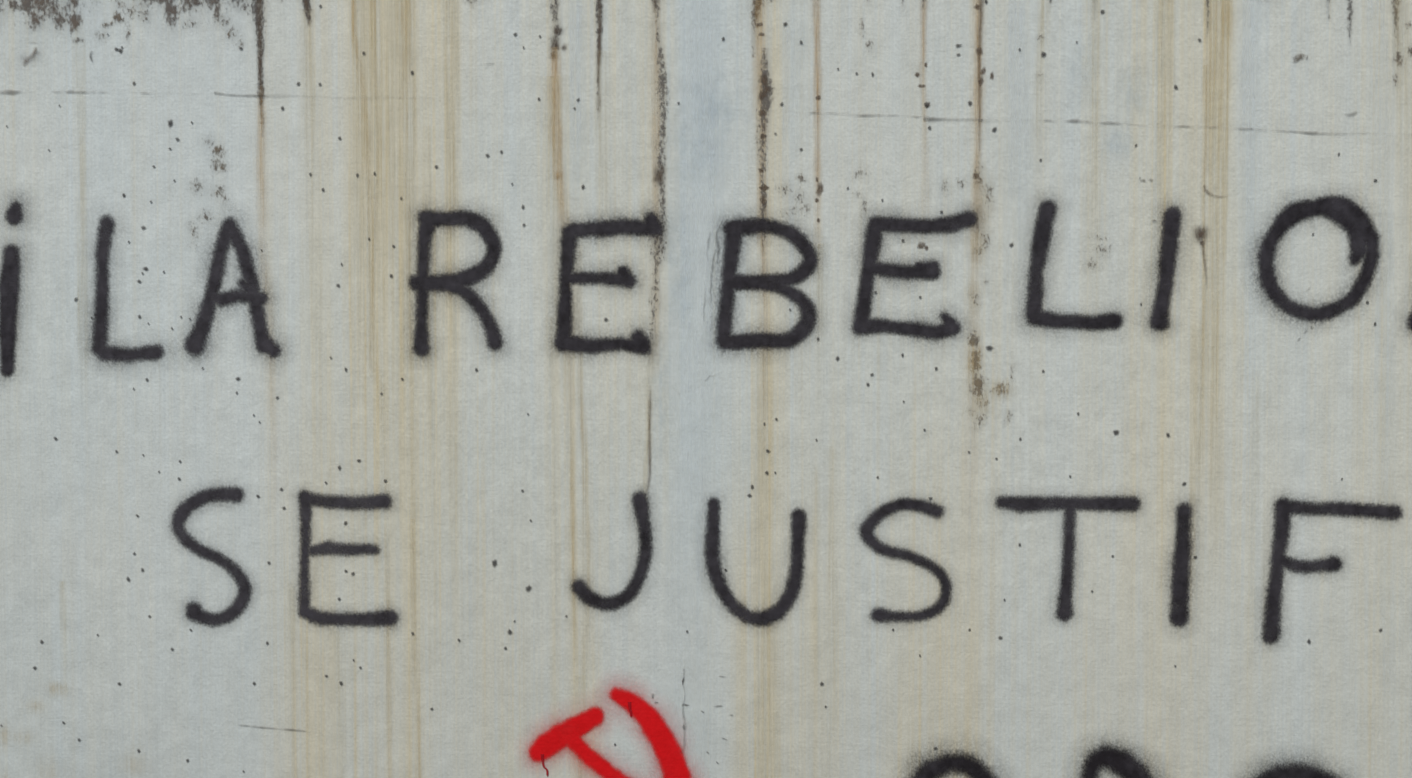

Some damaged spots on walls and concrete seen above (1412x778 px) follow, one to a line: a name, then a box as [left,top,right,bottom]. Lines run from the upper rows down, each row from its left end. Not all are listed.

rust [251,0,264,104]
rust [759,54,773,218]